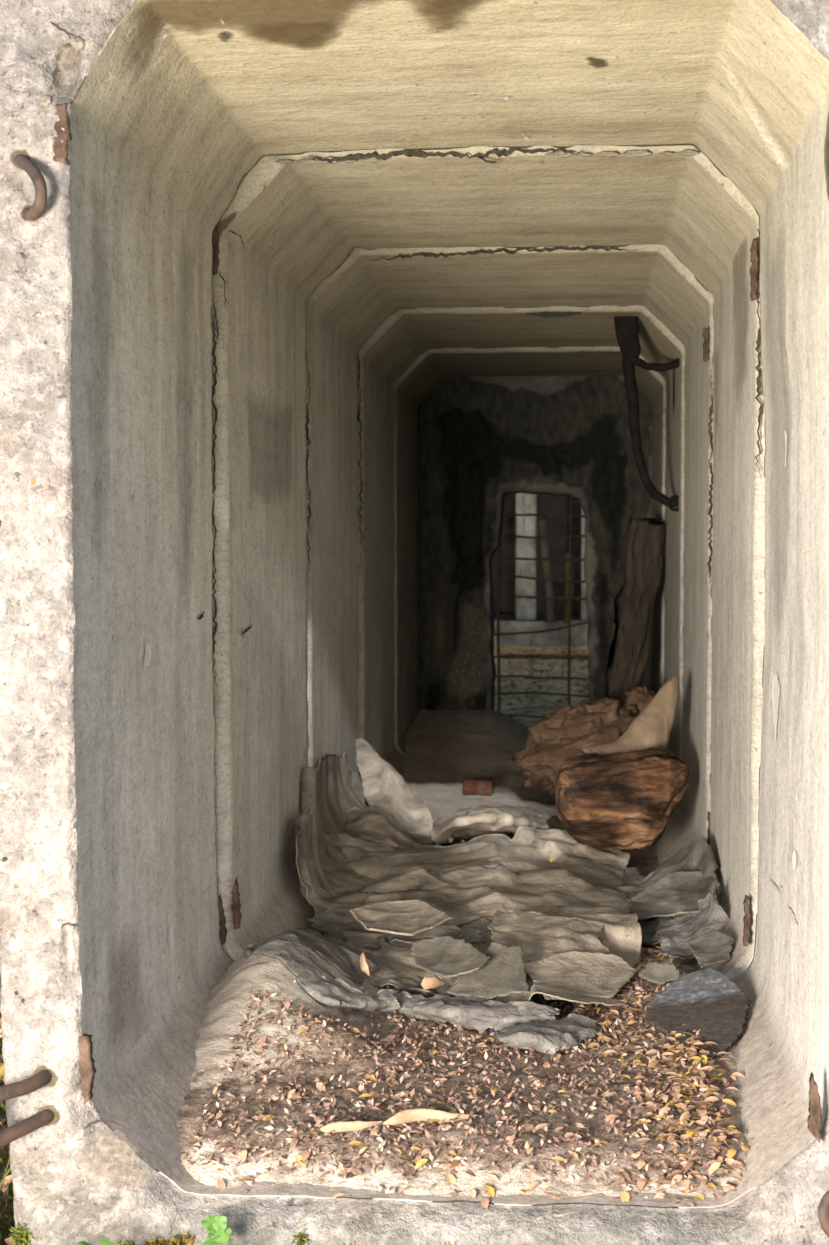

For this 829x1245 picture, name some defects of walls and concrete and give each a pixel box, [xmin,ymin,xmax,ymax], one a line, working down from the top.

damp [134,0,374,58]
damp [414,0,481,30]
crack [303,148,589,163]
crack [364,246,638,261]
crack [198,271,253,702]